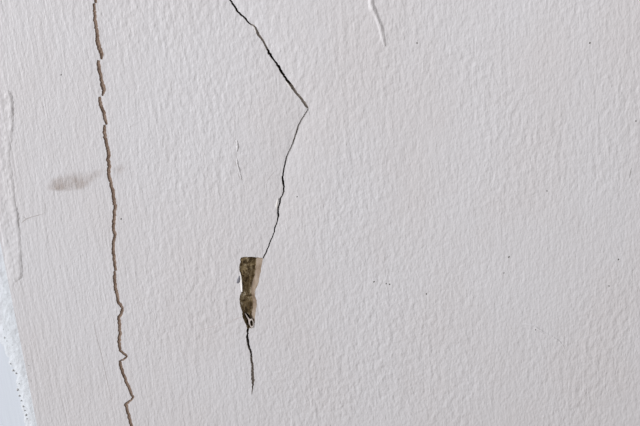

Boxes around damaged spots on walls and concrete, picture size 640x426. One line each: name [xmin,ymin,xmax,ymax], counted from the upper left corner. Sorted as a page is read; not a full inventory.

crack [93,0,135,426]
spalling [237,257,263,328]
crack [229,0,308,258]